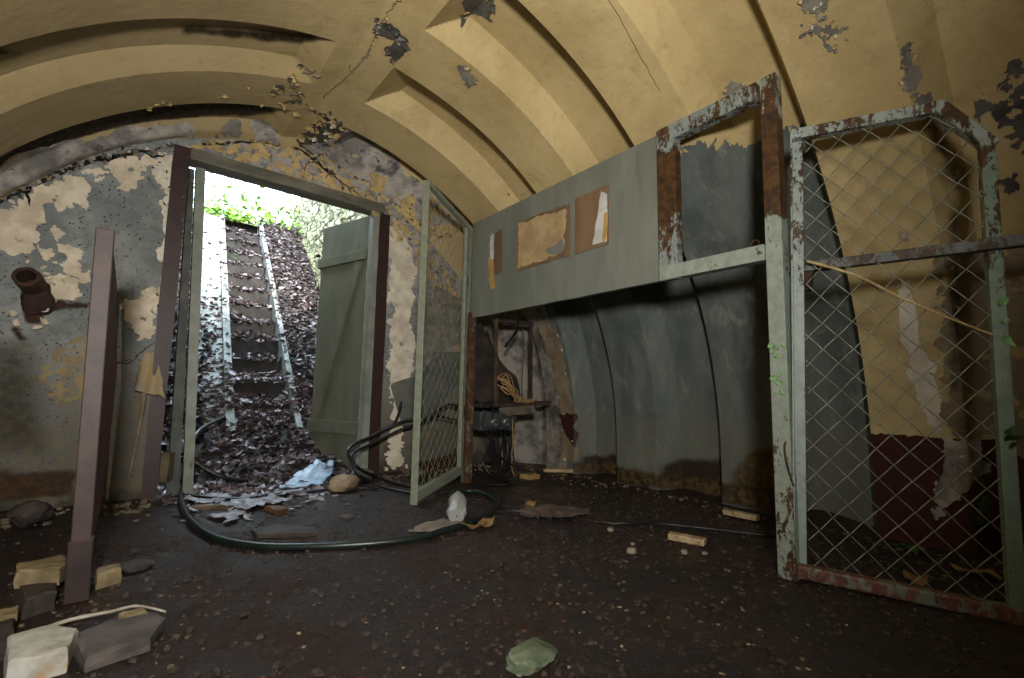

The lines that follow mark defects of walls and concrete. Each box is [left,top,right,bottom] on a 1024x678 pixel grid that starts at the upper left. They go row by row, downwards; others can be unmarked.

crack [323,0,401,98]
peeling [372,18,411,64]
peeling [457,65,479,89]
peeling [460,0,496,28]
crack [609,1,660,90]
peeling [798,0,849,53]
peeling [899,42,933,105]
peeling [974,58,1024,155]
peeling [998,173,1020,195]
peeling [0,64,464,481]
leakage [574,451,776,512]